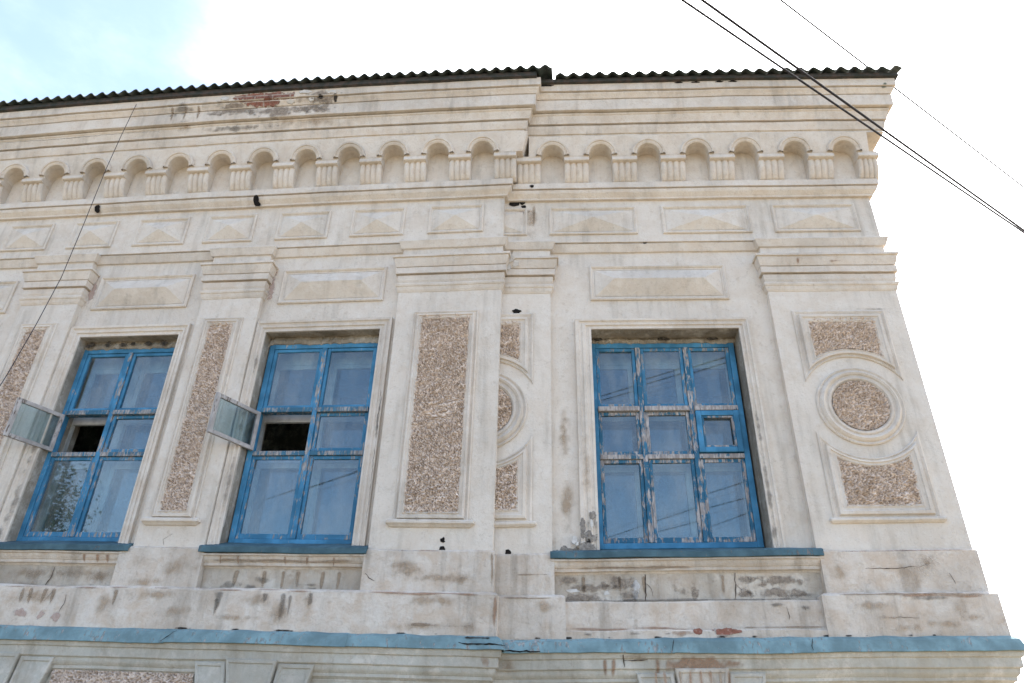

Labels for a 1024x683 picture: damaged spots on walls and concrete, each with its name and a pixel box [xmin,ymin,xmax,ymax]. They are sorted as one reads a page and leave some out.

peeling [210,90,337,118]
spalling [560,511,597,551]
leakage [20,588,55,602]
leakage [214,570,267,619]
leakage [276,571,325,617]
spalling [740,576,806,597]
flaking render [693,627,742,637]